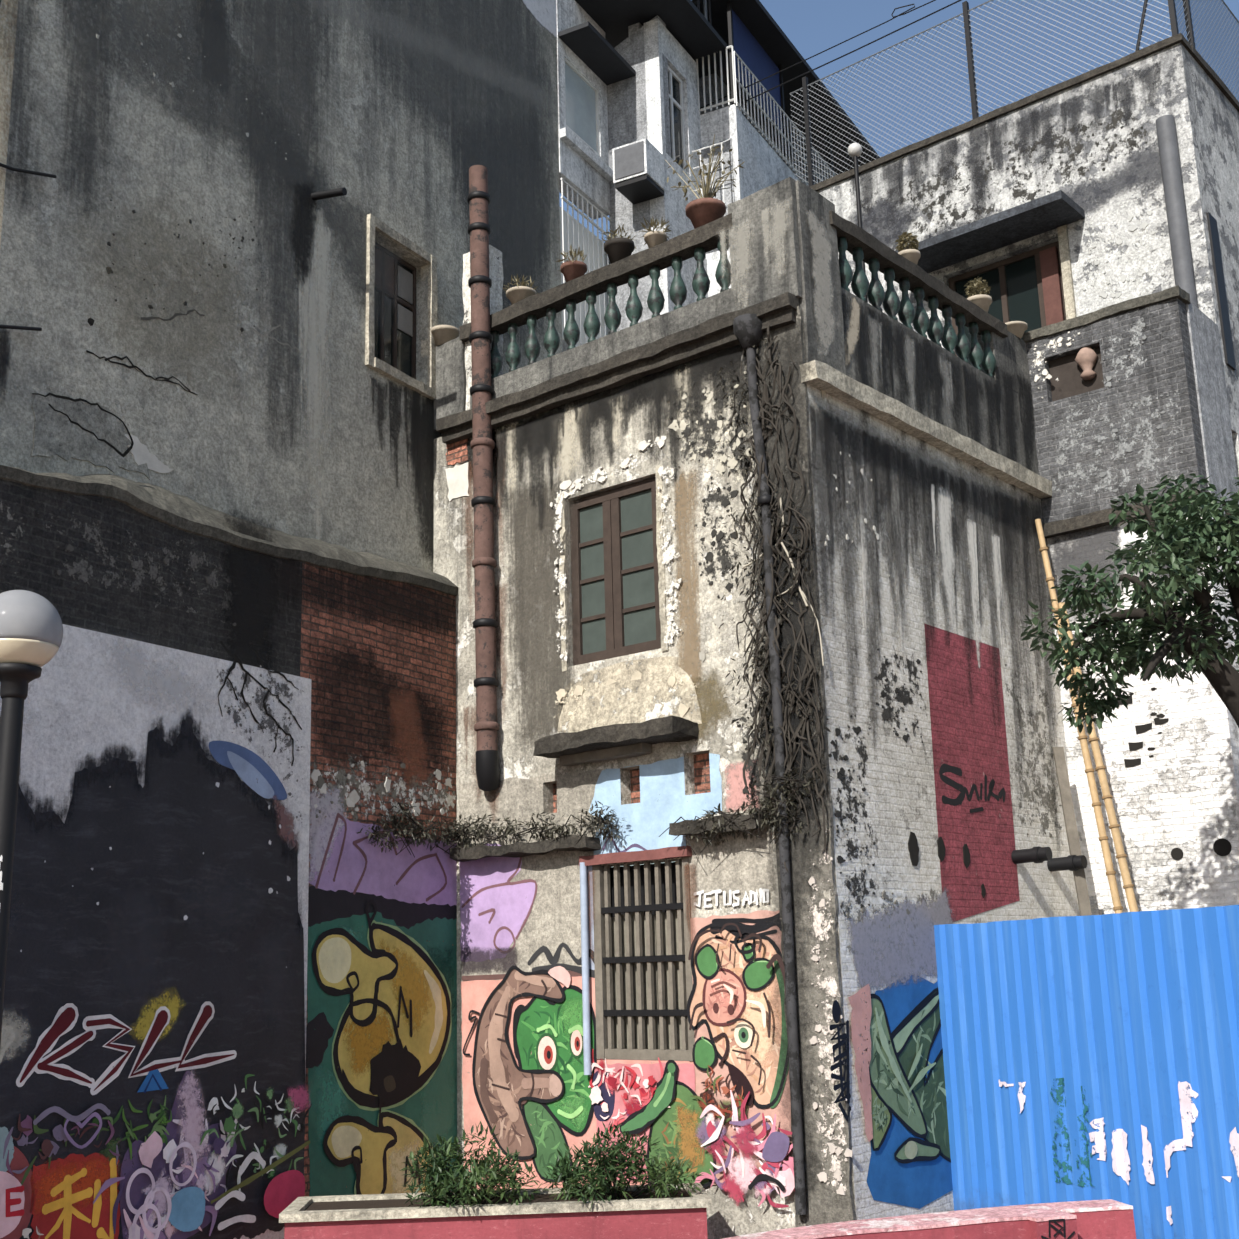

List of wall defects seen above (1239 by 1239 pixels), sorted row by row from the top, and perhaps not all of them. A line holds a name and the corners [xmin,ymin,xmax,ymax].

spalling [31,392,173,480]
peeling [0,500,236,626]
crack [86,350,198,395]
damp [63,0,397,540]
crack [218,641,302,766]
damp [492,356,774,825]
peeling [550,371,754,661]
peeling [658,466,766,754]
damp [841,293,1034,470]
damp [810,407,1174,833]
damp [851,63,1163,249]
peeling [806,642,937,1195]